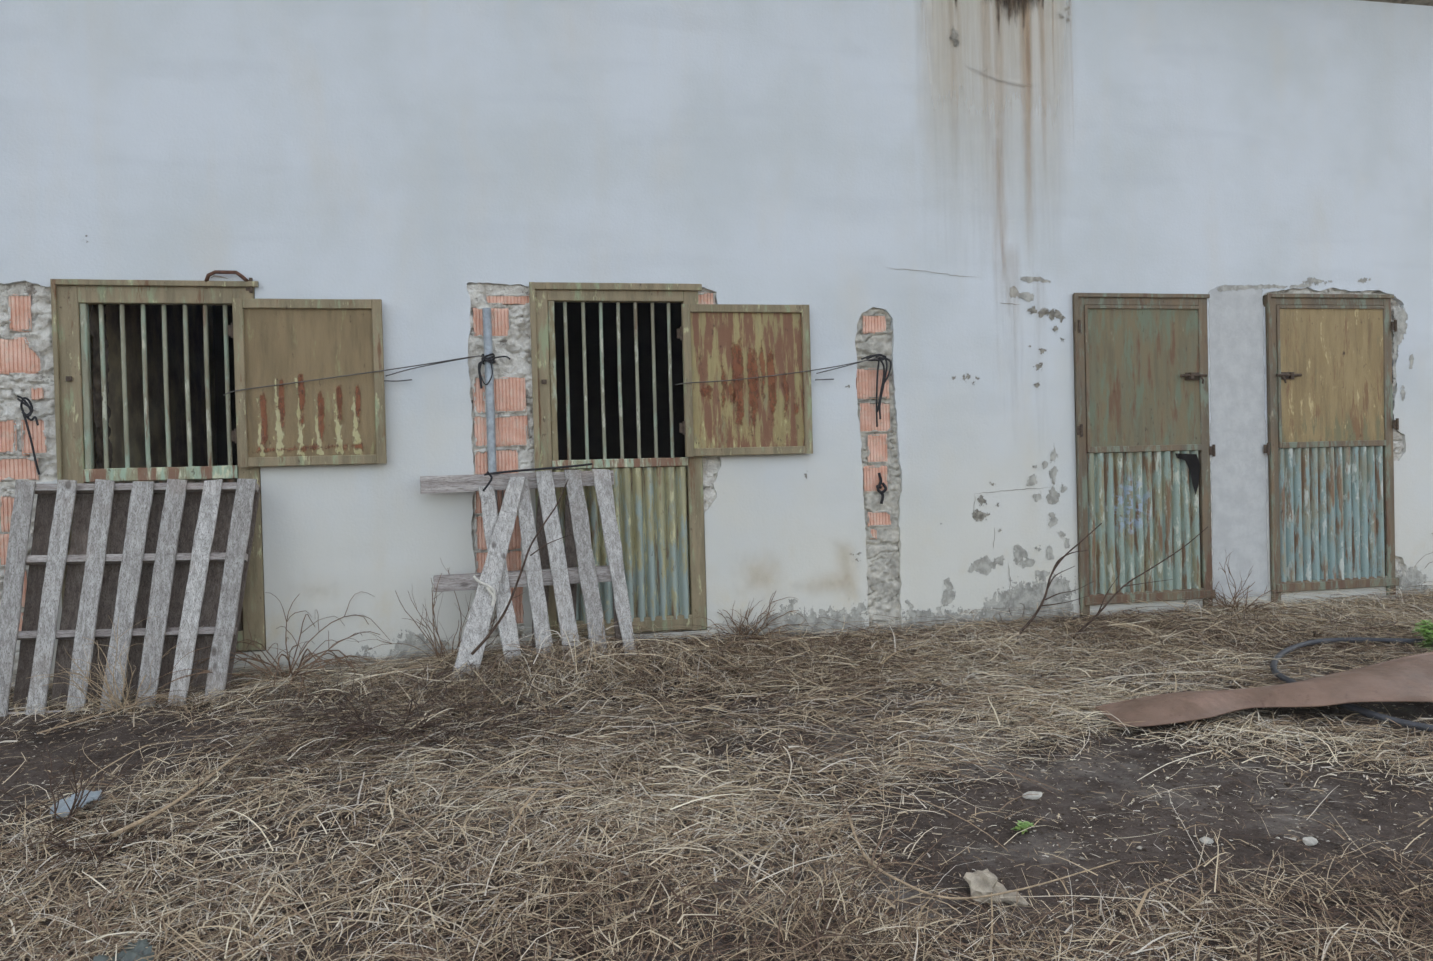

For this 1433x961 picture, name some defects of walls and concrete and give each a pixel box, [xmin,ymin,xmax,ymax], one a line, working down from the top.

leakage [927,0,1062,67]
peeling [1009,276,1065,388]
spalling [0,281,57,686]
rust [256,374,363,453]
spalling [467,283,535,645]
rust [700,341,798,436]
spalling [735,308,1109,640]